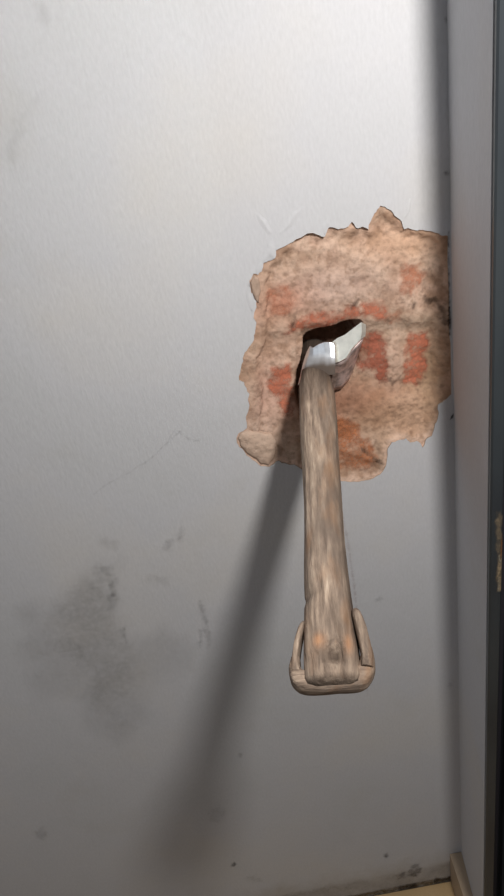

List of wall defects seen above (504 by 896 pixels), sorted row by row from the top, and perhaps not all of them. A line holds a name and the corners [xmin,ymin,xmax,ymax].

spalling [236,206,451,482]